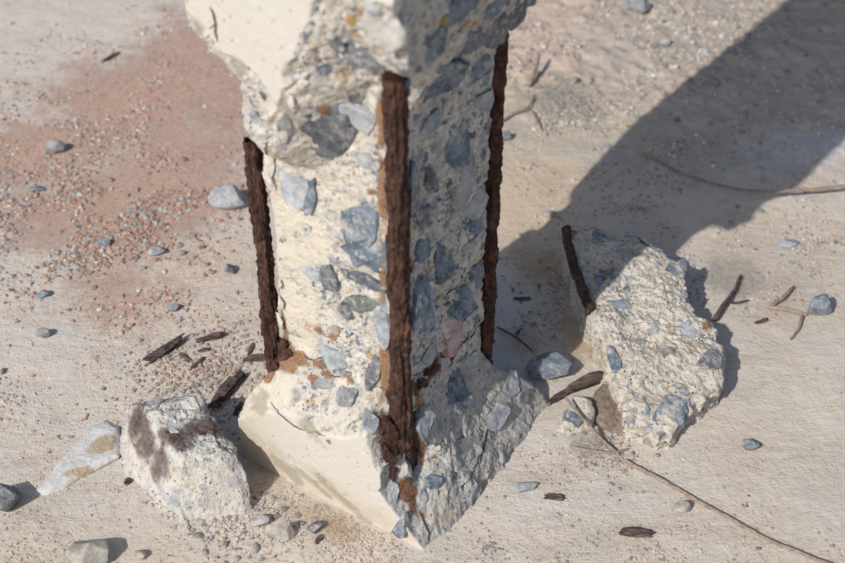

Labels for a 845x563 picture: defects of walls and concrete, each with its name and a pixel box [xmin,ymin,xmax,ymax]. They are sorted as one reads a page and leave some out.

rust [366,93,387,221]
spalling [185,0,549,548]
rust [263,309,332,383]
rust [374,346,417,513]
rust [414,428,426,465]
crack [471,428,488,478]